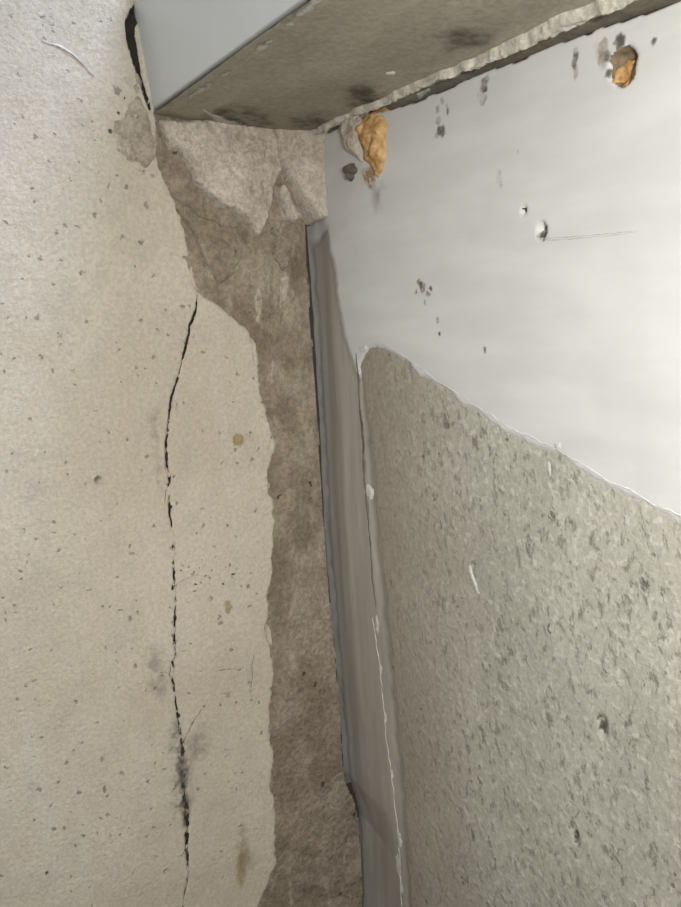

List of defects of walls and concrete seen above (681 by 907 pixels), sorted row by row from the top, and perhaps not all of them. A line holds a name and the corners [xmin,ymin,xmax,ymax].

rust [341,107,388,187]
crack [161,295,202,756]
crack [305,225,361,850]
peeling [108,71,681,907]
crack [172,780,189,907]